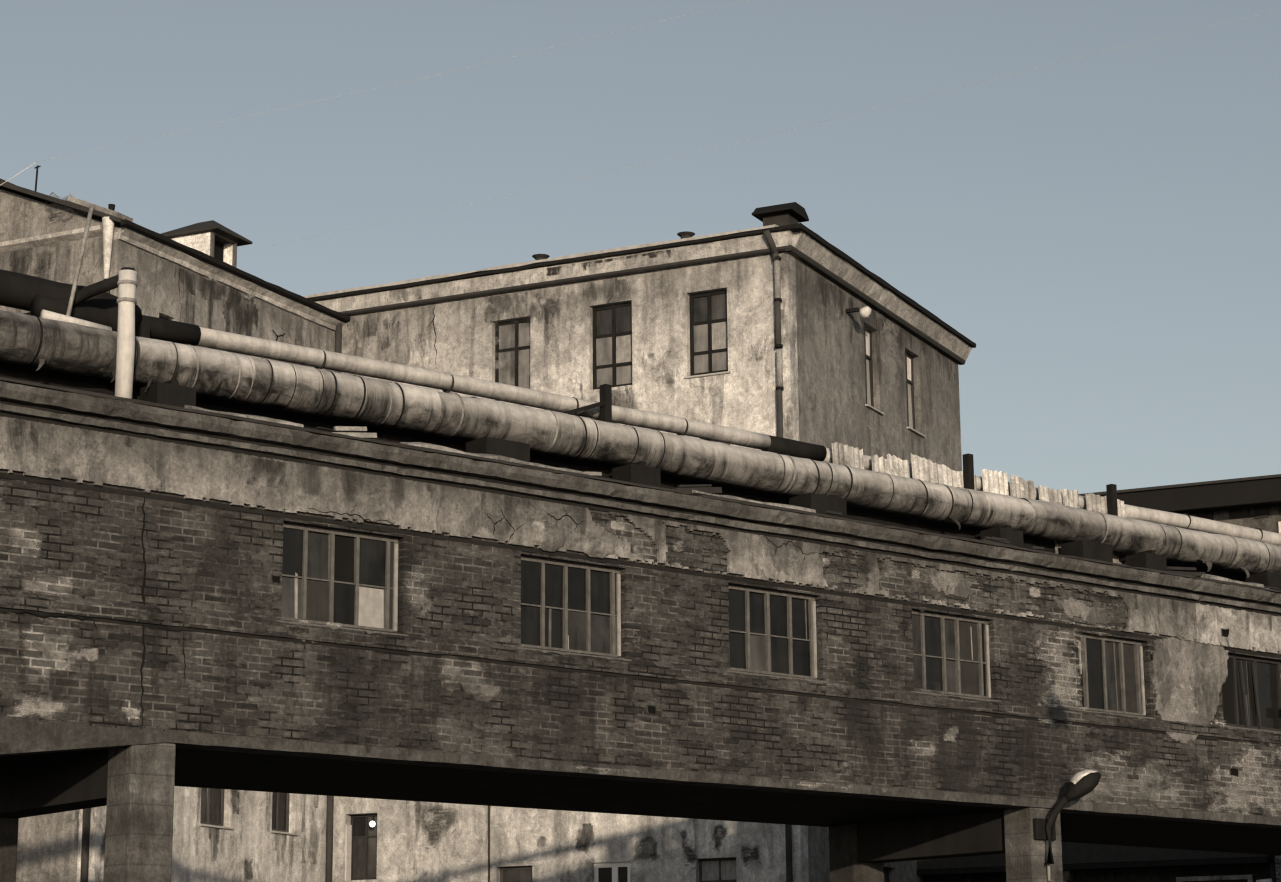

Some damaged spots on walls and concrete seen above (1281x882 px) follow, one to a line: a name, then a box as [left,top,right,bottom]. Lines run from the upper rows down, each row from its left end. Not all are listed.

water stain [182,271,258,336]
crack [485,507,585,540]
crack [12,497,191,729]
flaking render [419,803,458,849]
flaking render [680,831,697,870]
flaking render [712,825,728,851]
flaking render [741,845,762,867]